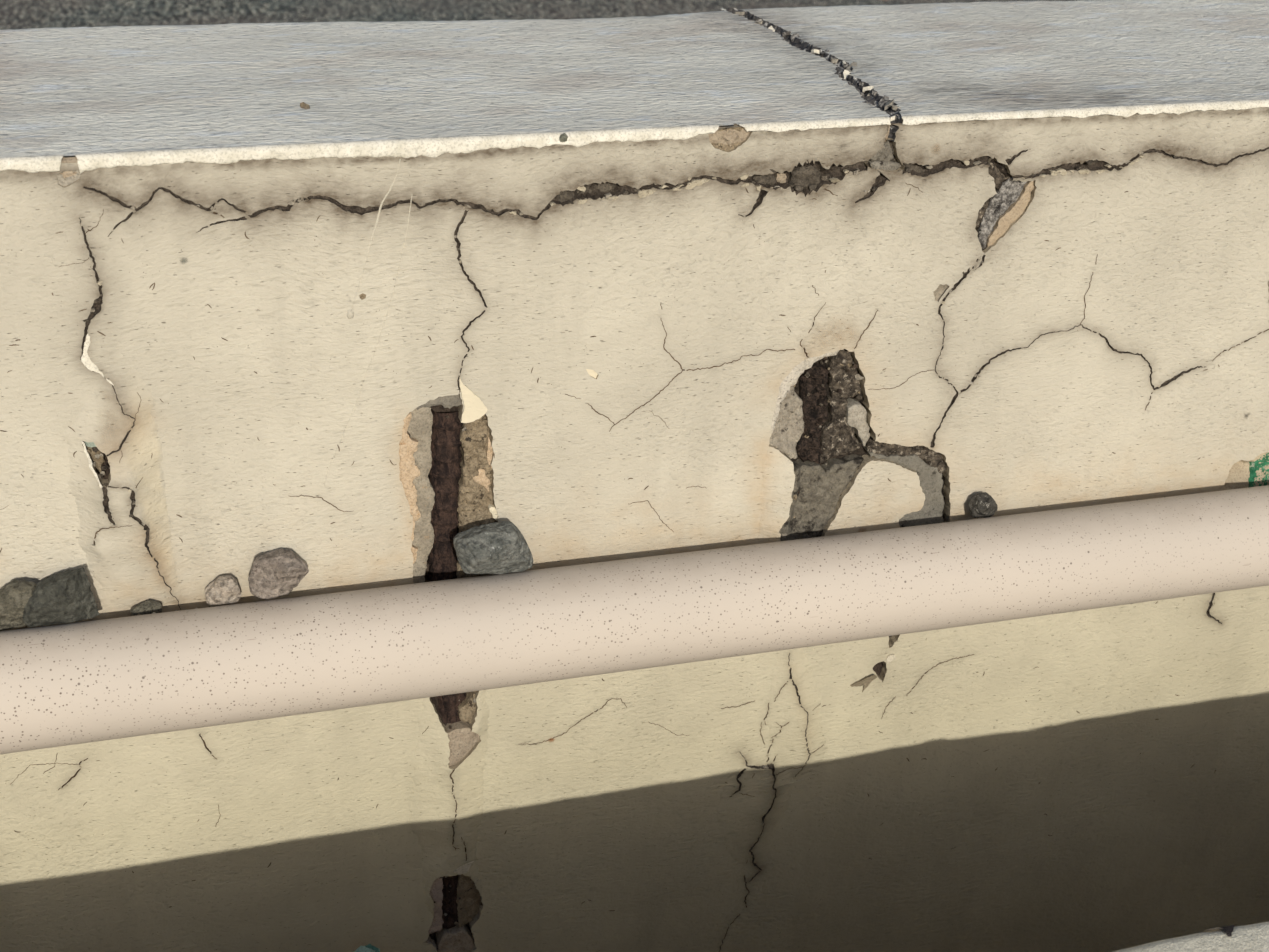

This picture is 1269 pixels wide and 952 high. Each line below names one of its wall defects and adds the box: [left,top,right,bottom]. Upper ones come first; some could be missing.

spalling [975,157,1037,253]
crack [66,7,1269,610]
spalling [82,441,111,488]
spalling [399,377,499,584]
spalling [769,349,951,541]
peeling [1223,452,1269,490]
spalling [429,691,481,770]
crack [718,653,823,952]
spalling [424,874,483,952]